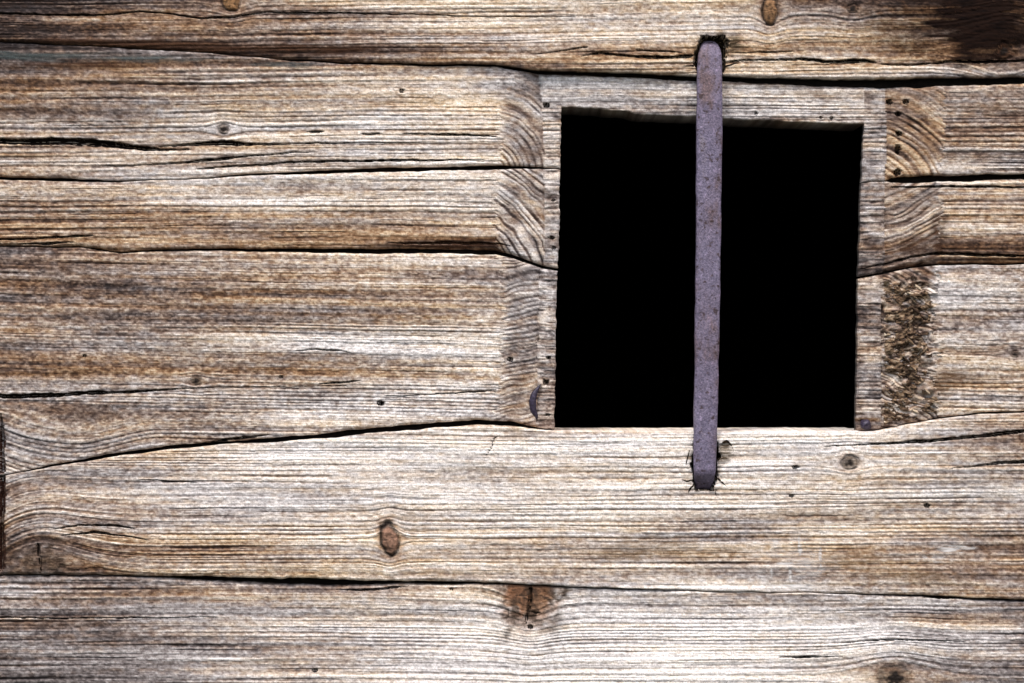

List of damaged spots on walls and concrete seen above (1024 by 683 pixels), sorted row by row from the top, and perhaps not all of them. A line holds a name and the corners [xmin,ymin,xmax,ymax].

crack [0,131,497,170]
crack [823,429,1024,469]
crack [0,380,362,571]